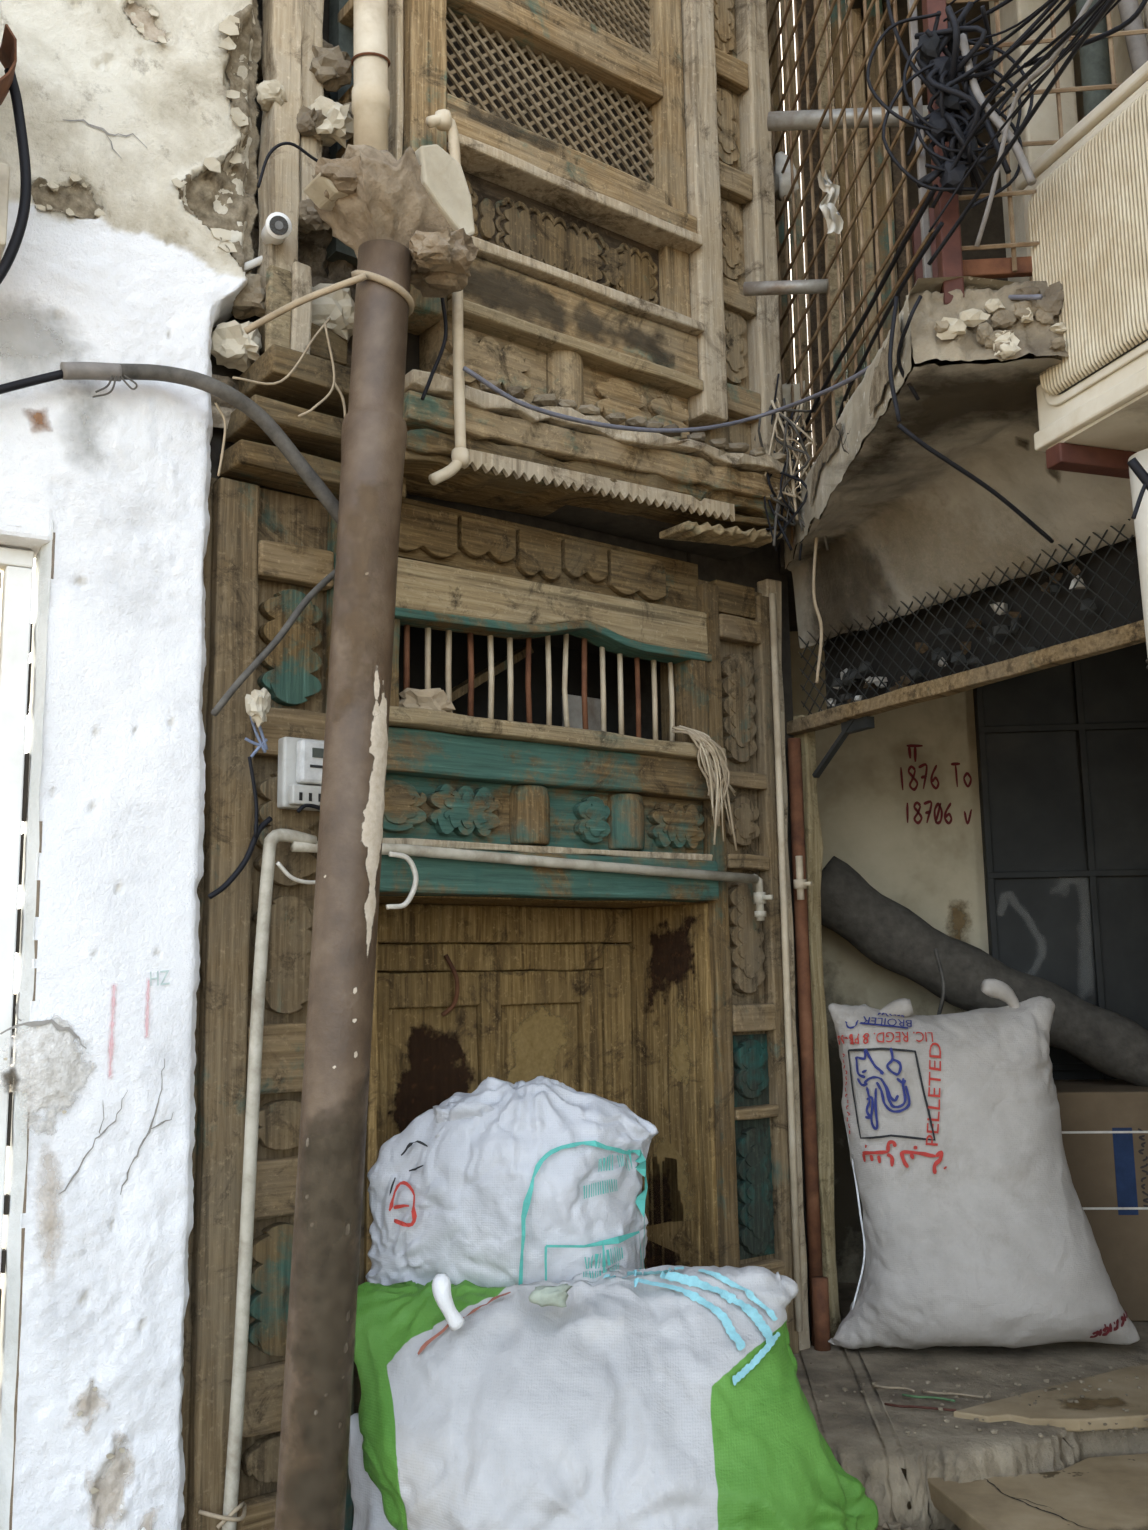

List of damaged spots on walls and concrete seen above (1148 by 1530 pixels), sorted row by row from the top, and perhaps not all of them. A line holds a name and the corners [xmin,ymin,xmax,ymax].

peeling [123,0,167,44]
spalling [171,0,262,275]
spalling [31,173,105,219]
spalling [3,1069,19,1093]